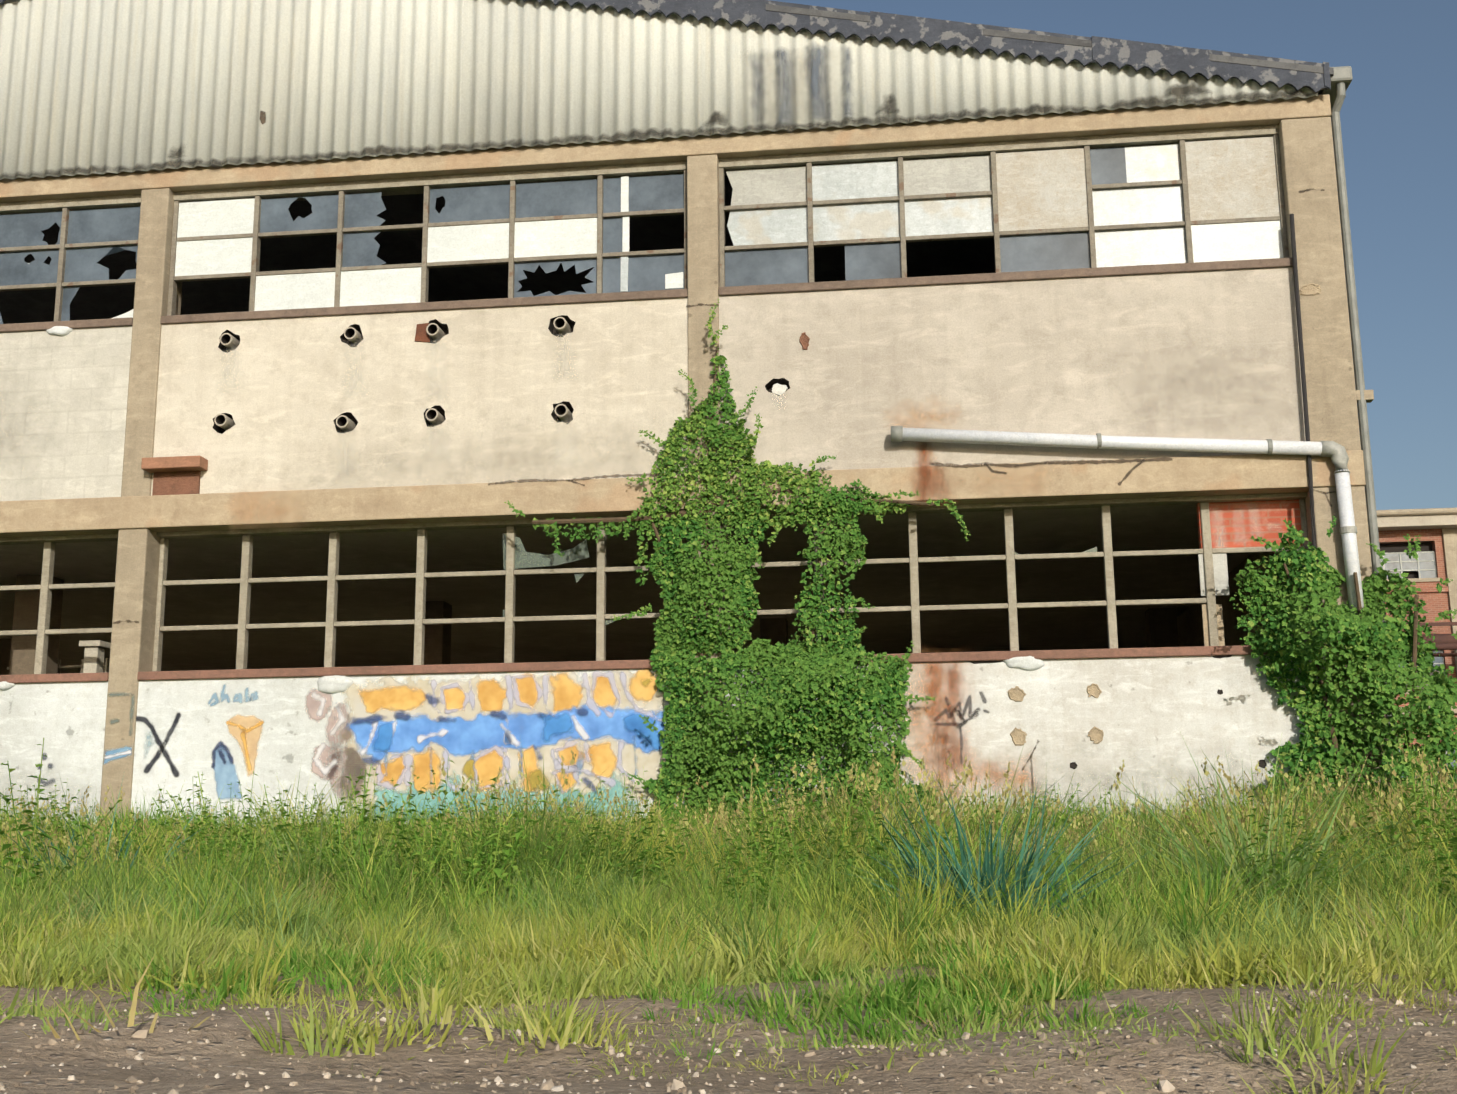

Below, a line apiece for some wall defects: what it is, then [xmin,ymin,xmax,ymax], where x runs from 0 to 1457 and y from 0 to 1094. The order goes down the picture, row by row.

damp [0,48,1309,178]
corrosion [920,445,943,494]
corrosion [925,665,961,782]